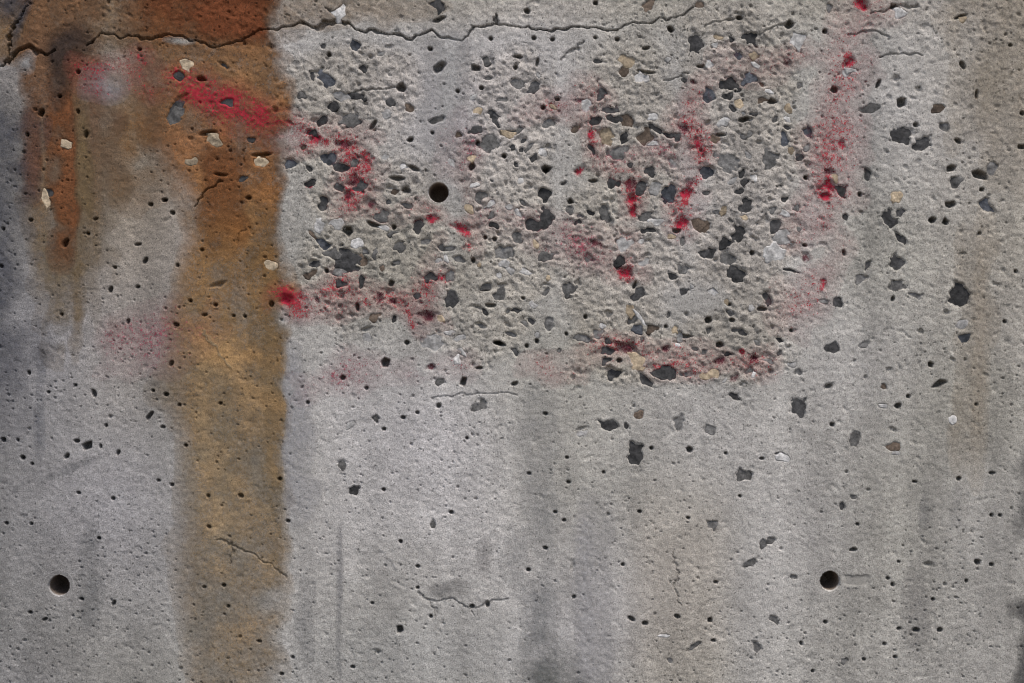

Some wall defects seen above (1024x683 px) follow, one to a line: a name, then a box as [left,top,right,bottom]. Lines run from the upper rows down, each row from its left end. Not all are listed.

crack [87,33,153,46]
crack [267,7,736,61]
corrosion [0,0,296,683]
crack [419,592,509,619]